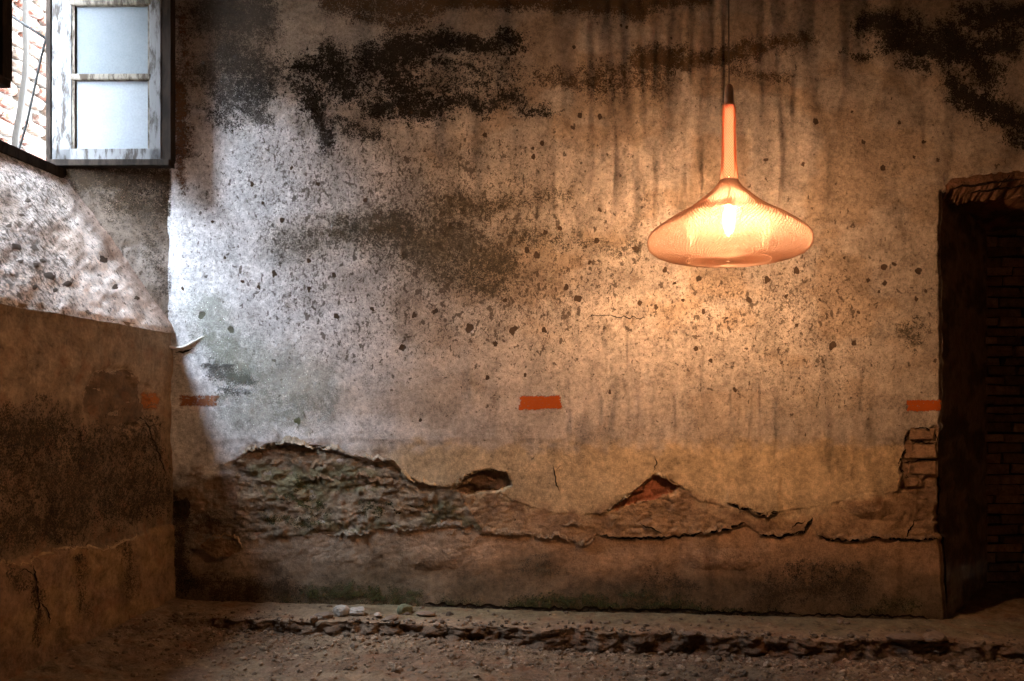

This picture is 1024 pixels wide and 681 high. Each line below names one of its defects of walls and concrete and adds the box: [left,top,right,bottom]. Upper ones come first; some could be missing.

leakage [184,0,820,166]
leakage [837,0,1024,150]
leakage [261,185,647,297]
leakage [0,391,306,647]
flaking render [235,417,599,546]
flaking render [607,456,687,512]
flaking render [896,424,939,503]